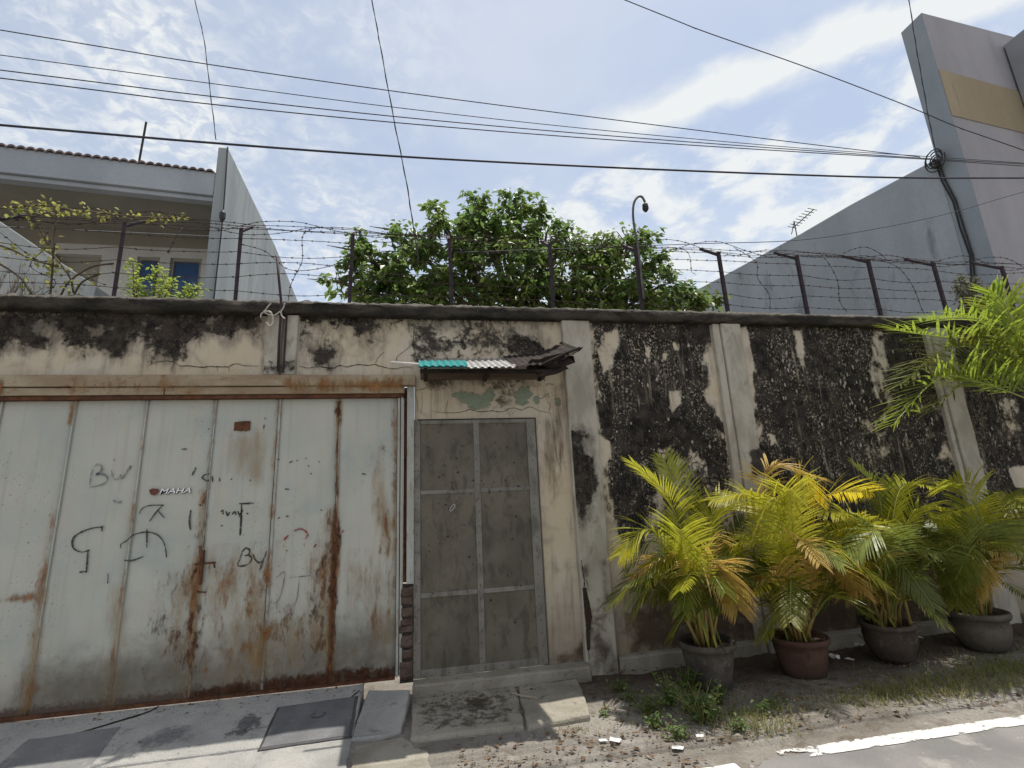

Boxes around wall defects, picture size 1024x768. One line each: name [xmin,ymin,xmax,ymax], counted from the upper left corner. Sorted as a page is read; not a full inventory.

leakage [0,311,262,363]
crack [151,360,247,371]
corrosion [320,379,407,595]
leakage [300,317,547,369]
peeling [452,387,495,410]
peeling [514,386,540,406]
leakage [571,323,736,548]
leakage [740,326,966,546]
leakage [955,330,1024,522]
corrosion [8,564,47,607]
corrosion [153,523,206,674]
corrosion [186,438,394,698]